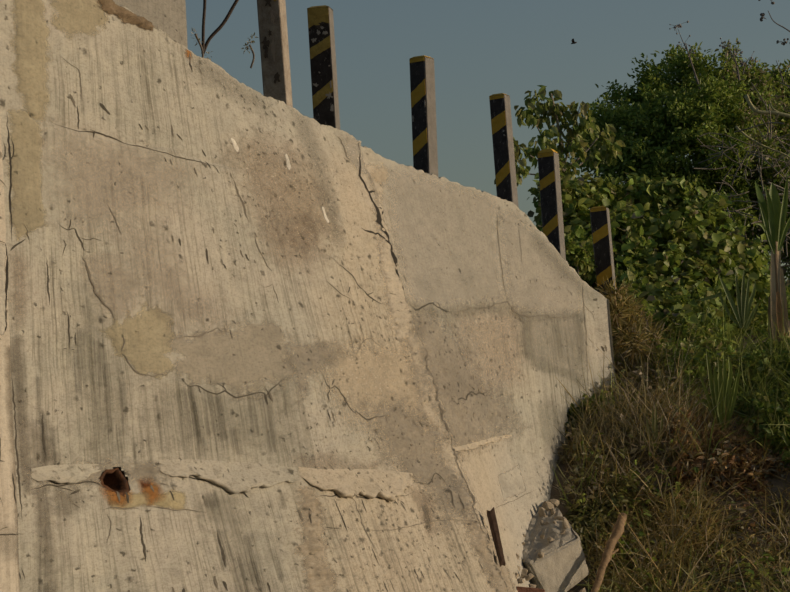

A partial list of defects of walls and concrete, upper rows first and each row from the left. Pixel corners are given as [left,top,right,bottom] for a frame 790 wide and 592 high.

crack [0,104,29,331]
crack [64,312,76,350]
crack [46,220,115,319]
crack [51,58,278,300]
crack [121,337,289,401]
crack [178,326,233,339]
crack [315,133,594,591]
crack [0,373,100,535]
rust [140,477,159,503]
spalling [407,316,514,592]